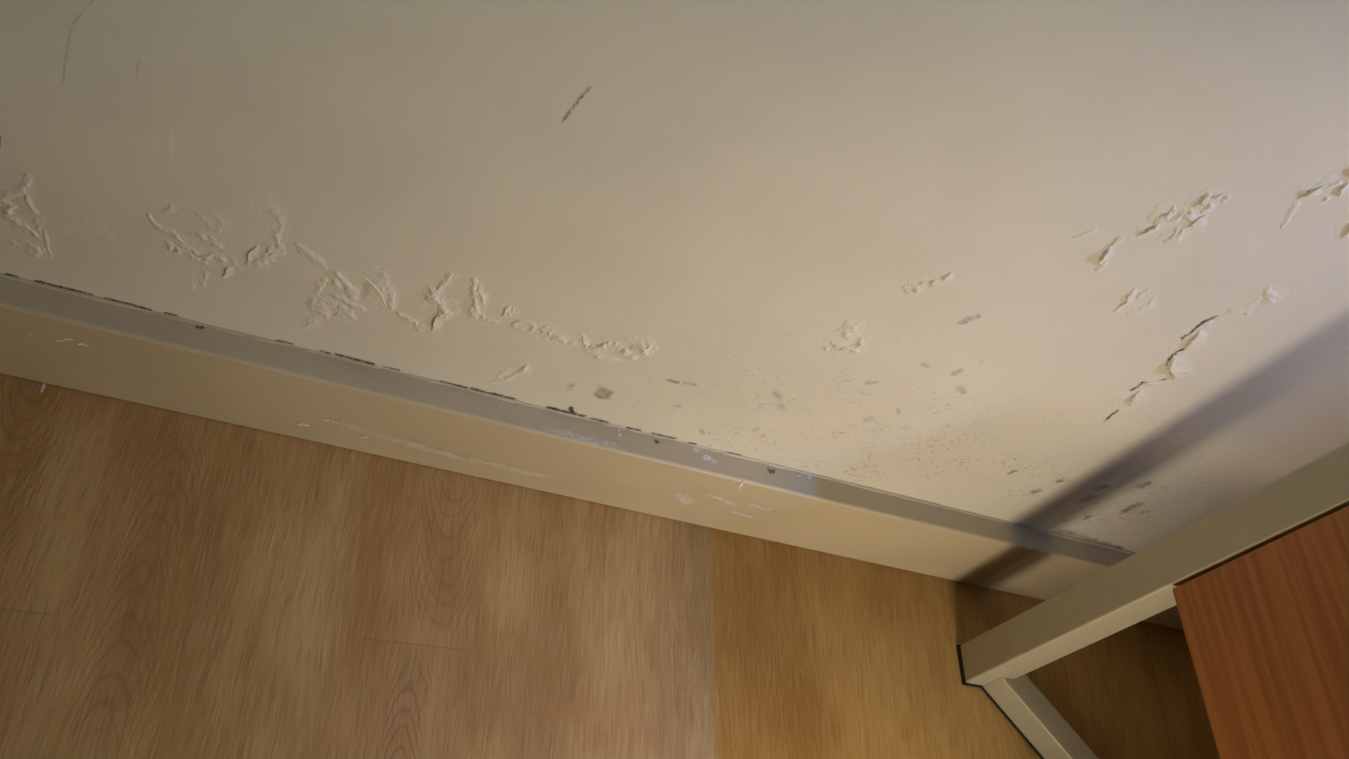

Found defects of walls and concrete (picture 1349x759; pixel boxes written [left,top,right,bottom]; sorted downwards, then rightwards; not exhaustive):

peeling [1279,163,1349,229]
peeling [1090,188,1235,273]
peeling [406,270,522,333]